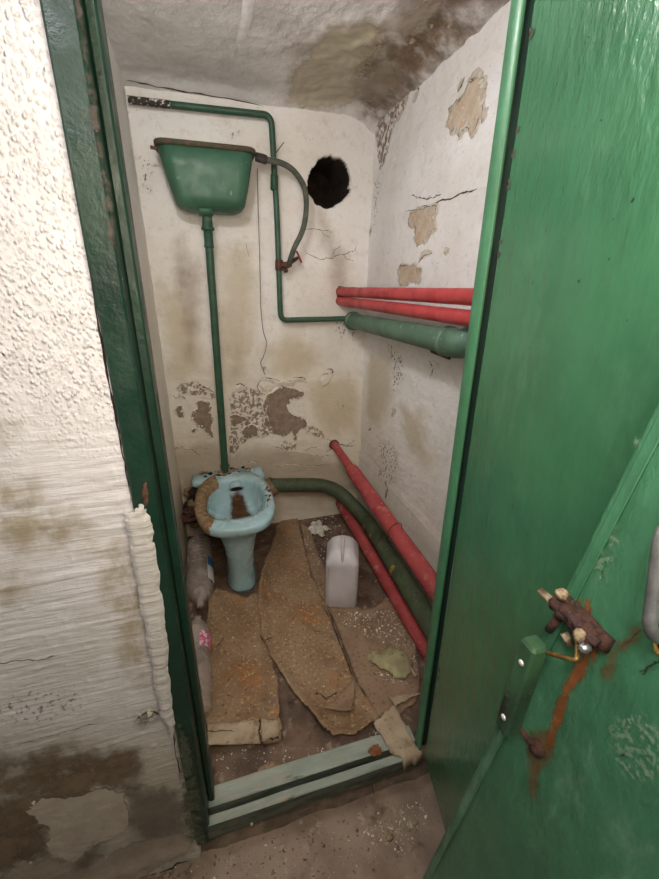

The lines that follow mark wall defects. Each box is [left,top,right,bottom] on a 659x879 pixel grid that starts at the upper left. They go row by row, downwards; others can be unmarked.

water stain [291,0,470,110]
peeling [364,23,472,168]
peeling [445,70,488,140]
peeling [408,202,438,247]
crack [408,188,477,211]
peeling [397,263,422,287]
peeling [173,381,216,439]
peeling [228,386,327,456]
water stain [0,752,188,871]